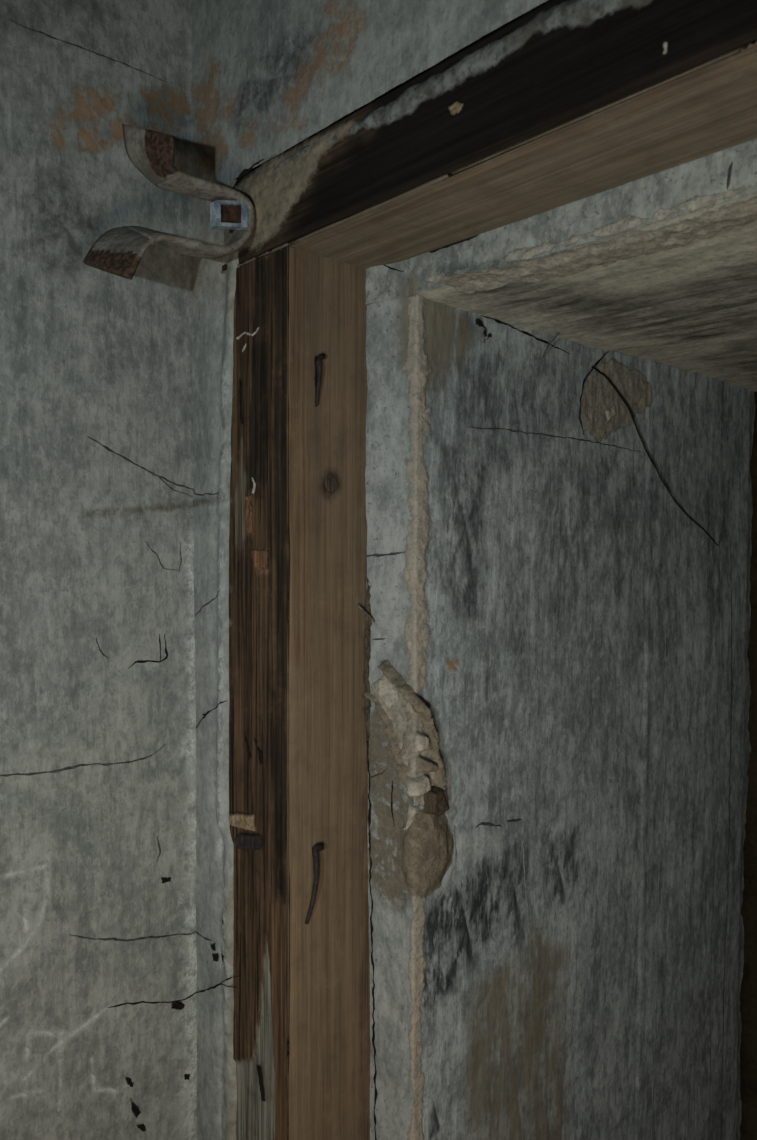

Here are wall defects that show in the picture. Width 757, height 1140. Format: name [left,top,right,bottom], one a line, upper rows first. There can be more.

crack [476,315,569,354]
spalling [579,351,652,441]
crack [470,427,645,453]
crack [88,437,219,497]
crack [146,542,182,571]
crack [96,634,168,669]
crack [195,701,226,729]
spalling [364,660,449,830]
crack [0,749,160,777]
crack [71,931,212,941]
crack [108,976,240,1010]